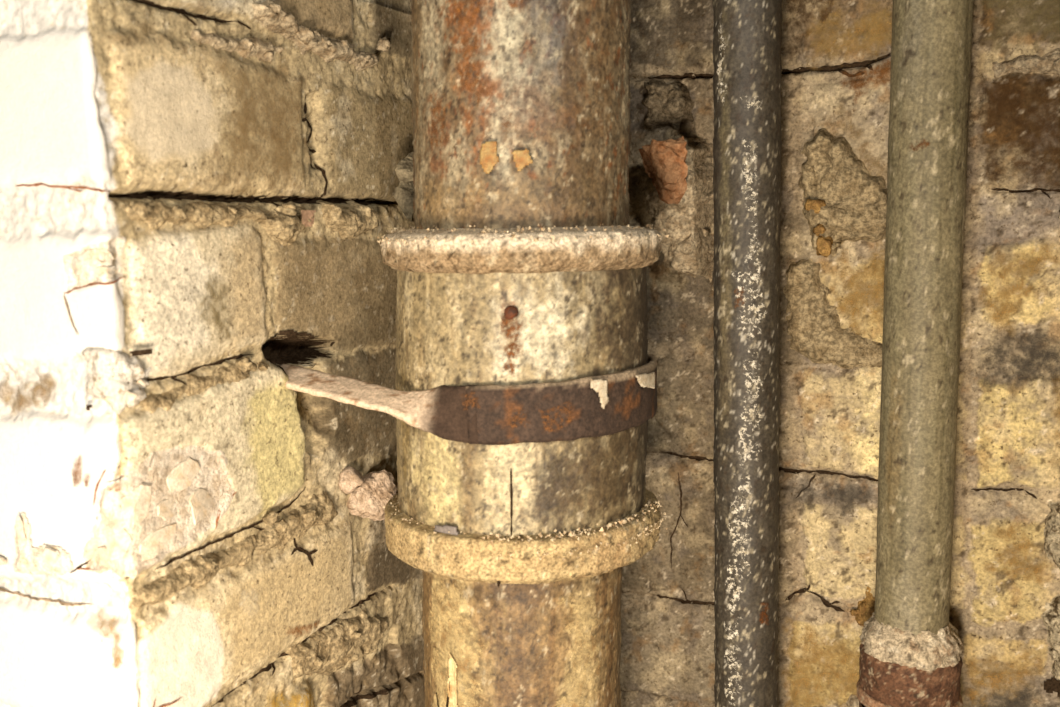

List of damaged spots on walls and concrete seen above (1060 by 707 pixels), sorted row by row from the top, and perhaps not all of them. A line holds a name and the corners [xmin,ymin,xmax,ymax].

crack [17,97,395,207]